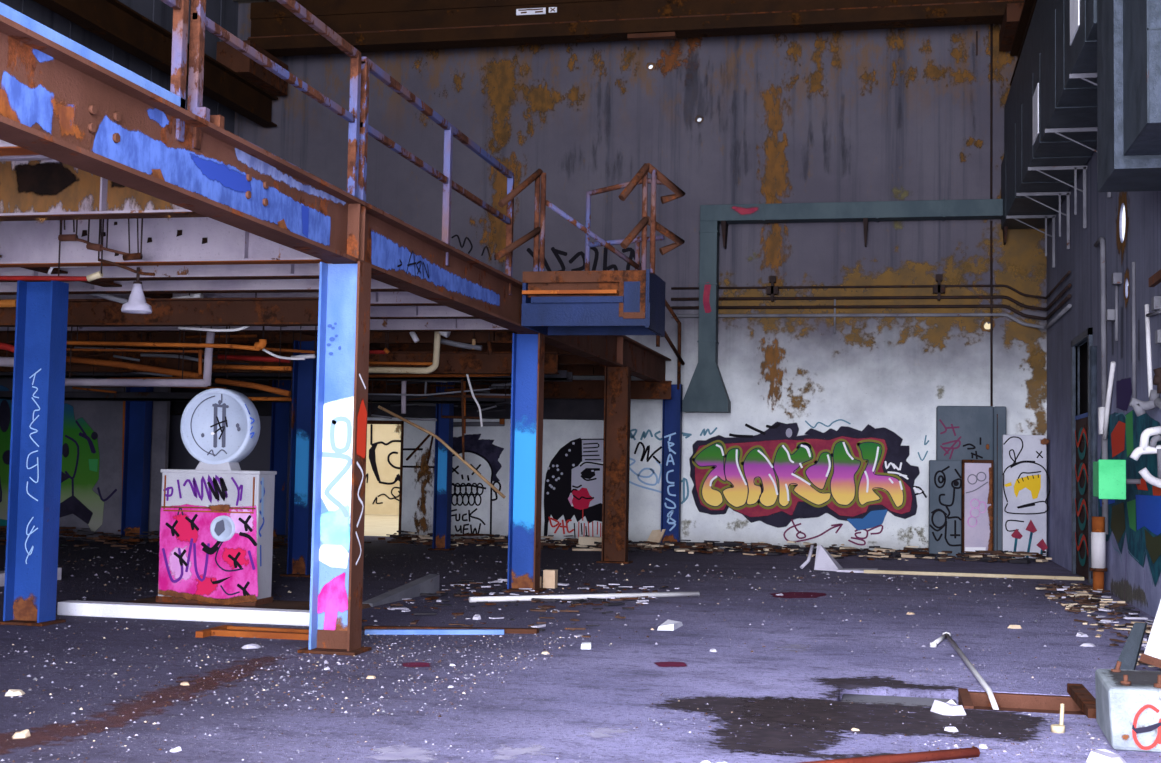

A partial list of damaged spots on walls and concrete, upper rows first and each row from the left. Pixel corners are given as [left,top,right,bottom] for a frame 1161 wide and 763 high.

rust [470,134,527,266]
peeling [481,44,585,154]
rust [756,84,792,204]
rust [718,219,1047,435]
rust [13,595,38,621]
damp [645,676,1052,760]